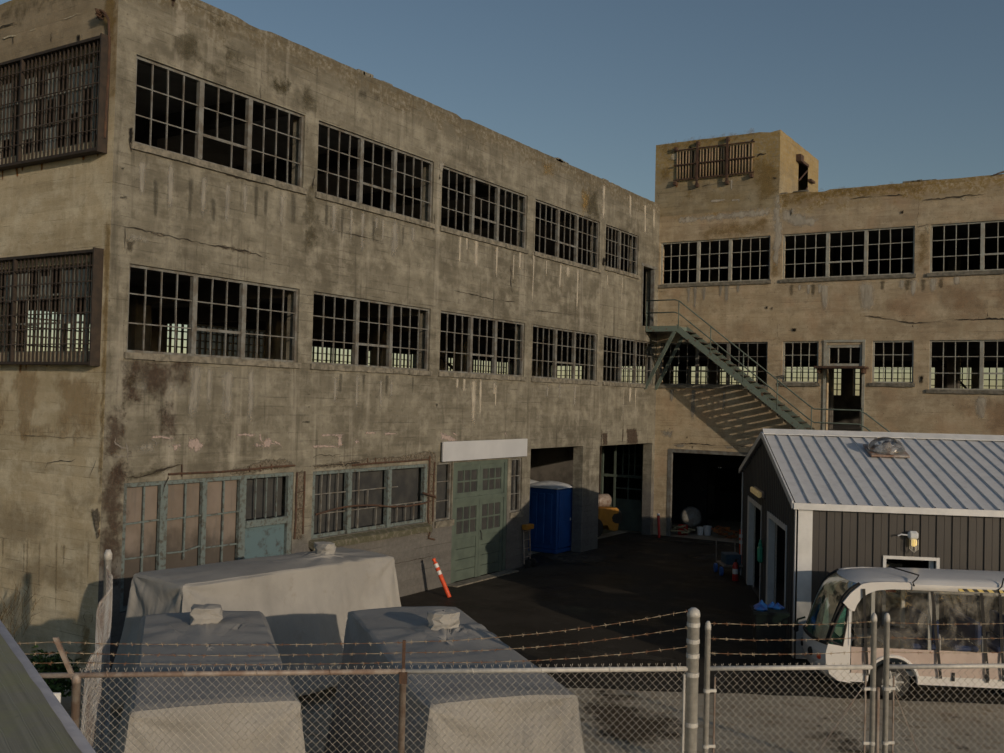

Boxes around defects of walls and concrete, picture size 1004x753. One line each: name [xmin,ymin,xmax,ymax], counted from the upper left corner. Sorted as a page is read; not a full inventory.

crack [125,227,269,258]
crack [864,312,1004,327]